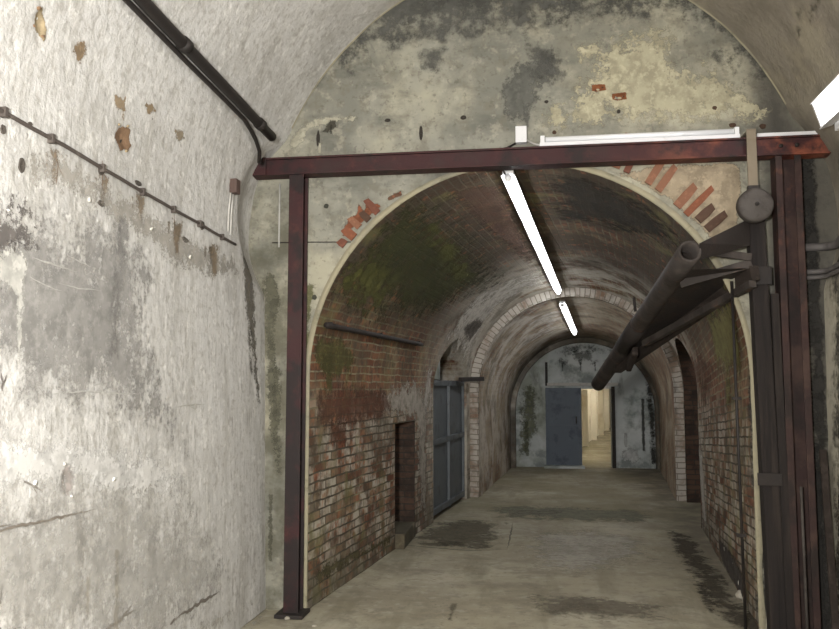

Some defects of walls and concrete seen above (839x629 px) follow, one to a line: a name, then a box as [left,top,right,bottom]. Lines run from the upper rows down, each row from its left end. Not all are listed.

flaking render [33,6,47,42]
water stain [502,48,566,125]
flaking render [542,27,769,132]
flaking render [114,123,131,152]
flaking render [336,191,402,248]
flaking render [611,163,741,237]
crack [0,509,94,532]
water stain [416,520,498,549]